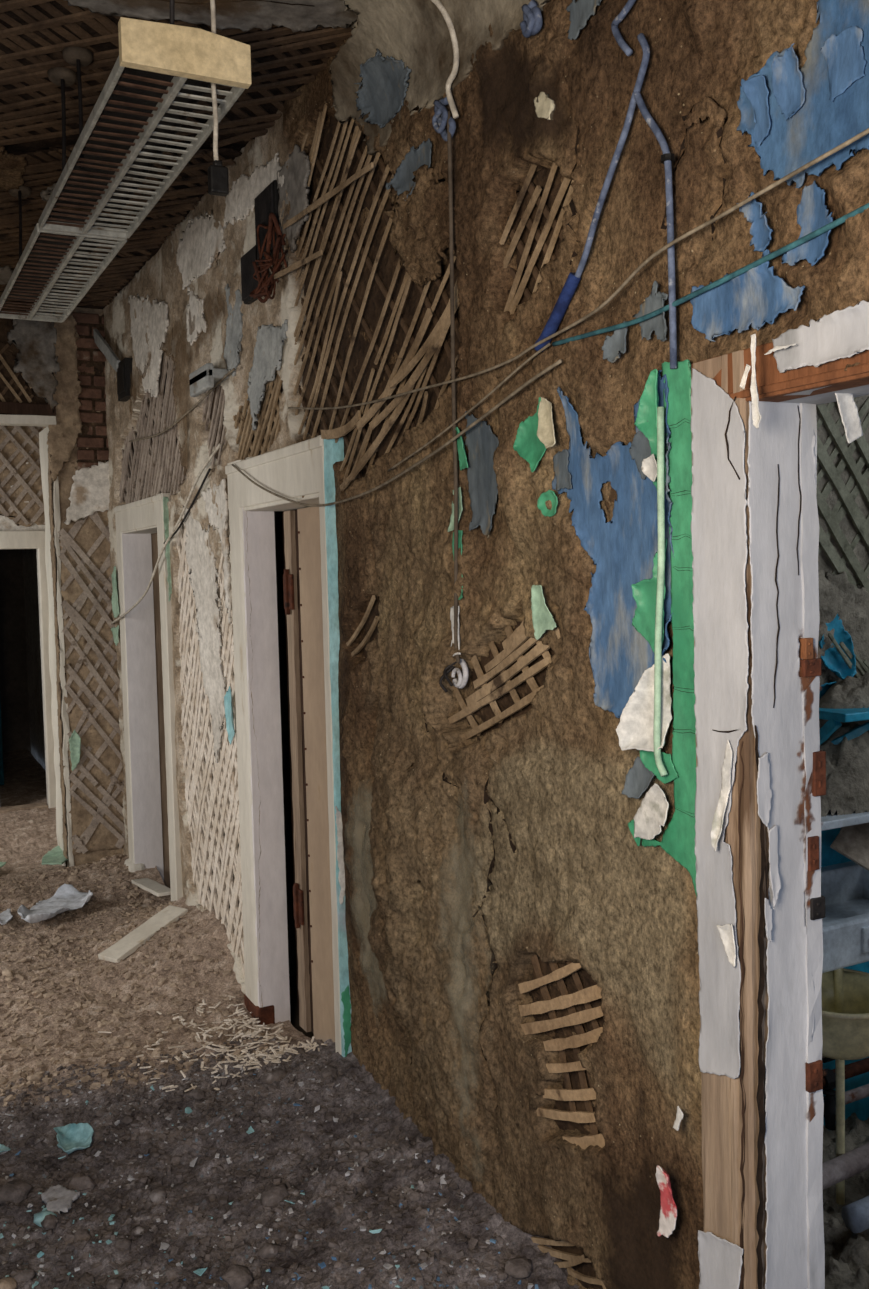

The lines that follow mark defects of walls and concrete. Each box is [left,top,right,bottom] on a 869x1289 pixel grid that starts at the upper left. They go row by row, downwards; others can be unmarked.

spalling [203,49,461,491]
spalling [0,0,353,977]
peeling [341,986,351,1058]
crack [442,772,516,1061]
peeling [448,0,869,1289]
rust [795,742,822,907]
rust [800,648,821,721]